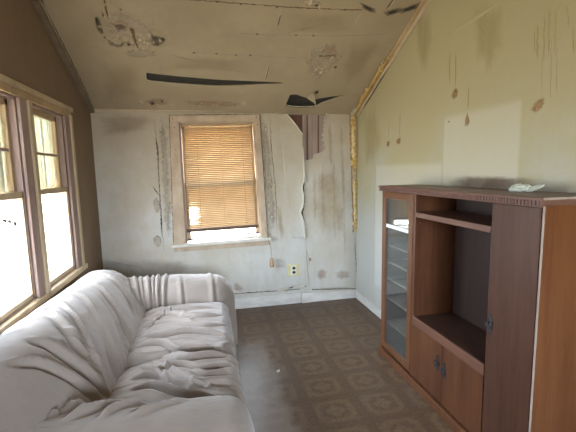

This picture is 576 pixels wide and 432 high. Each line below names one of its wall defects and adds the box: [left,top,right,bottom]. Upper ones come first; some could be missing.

peeling [95,0,172,57]